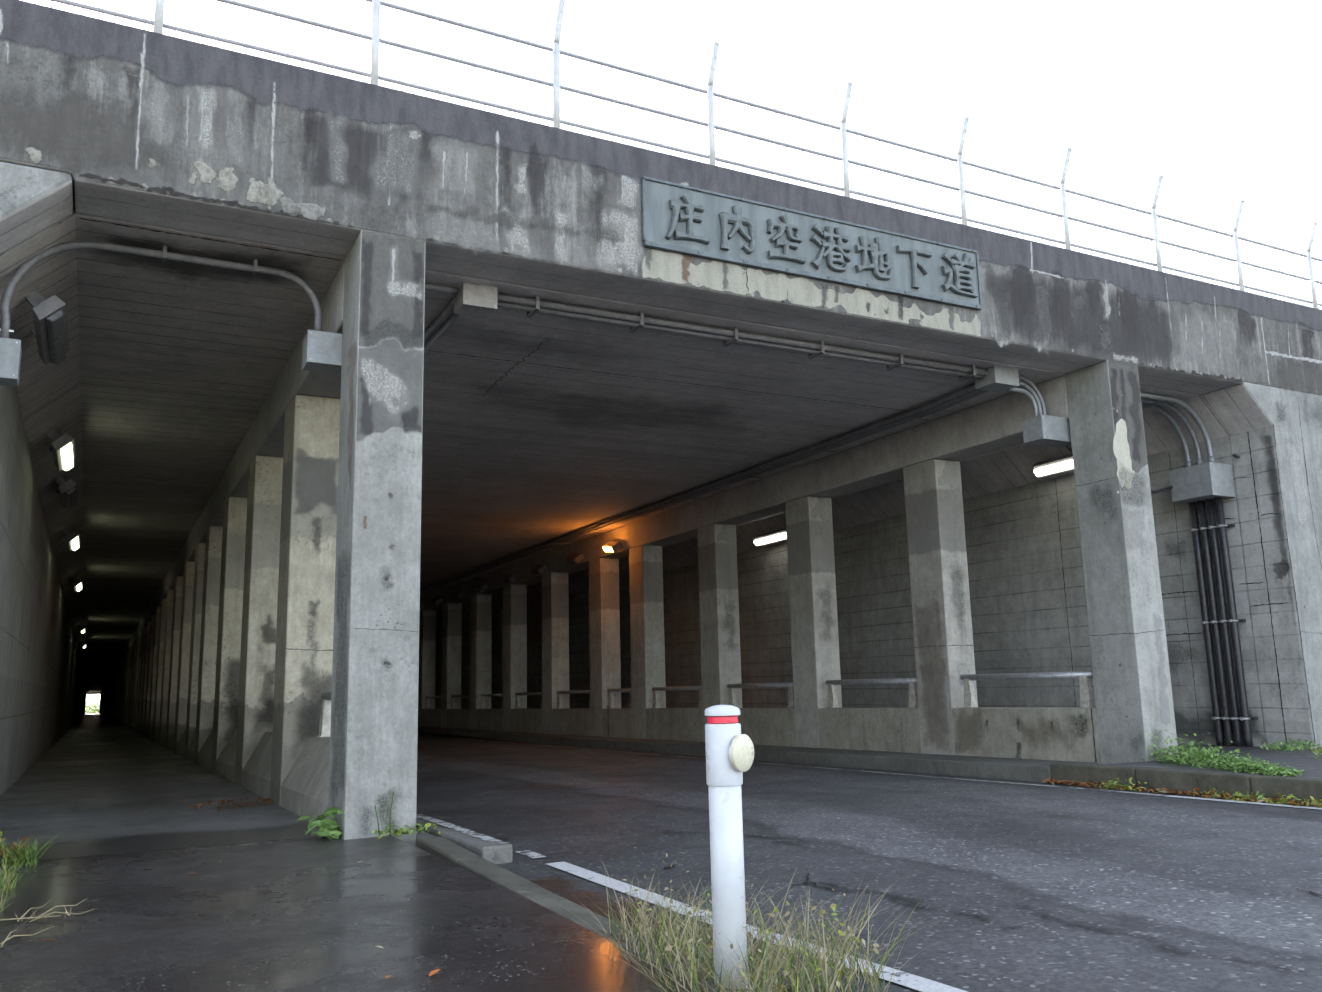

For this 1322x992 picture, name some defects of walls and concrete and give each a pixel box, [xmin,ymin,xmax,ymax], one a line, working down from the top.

spalling [76,161,352,227]
damp [0,0,1322,563]
peeling [1113,407,1139,494]